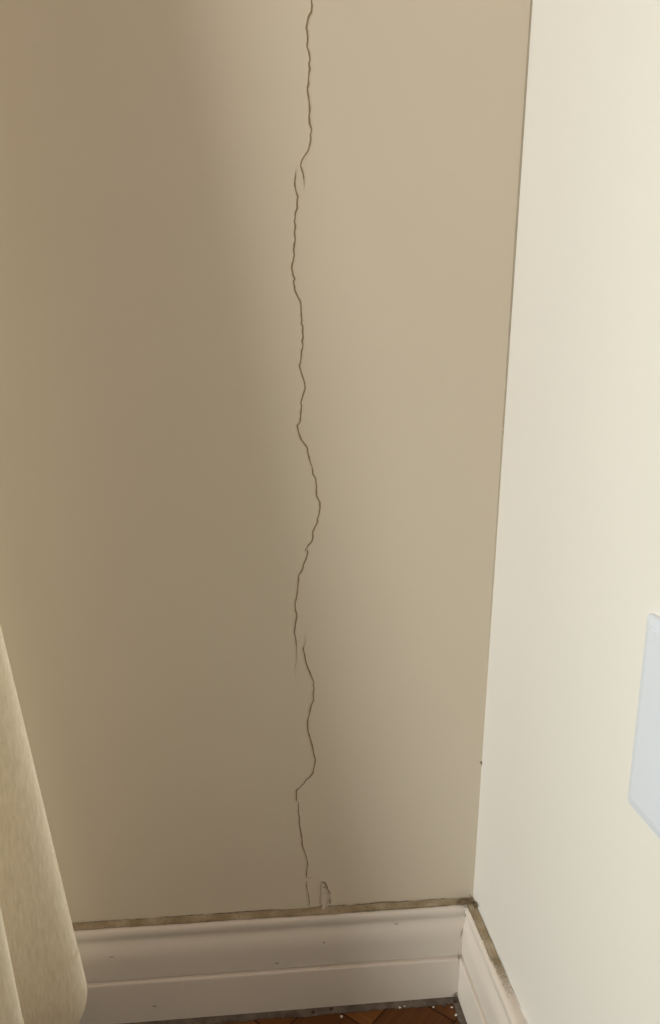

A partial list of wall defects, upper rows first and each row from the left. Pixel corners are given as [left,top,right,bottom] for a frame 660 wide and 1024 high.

crack [290,0,322,908]